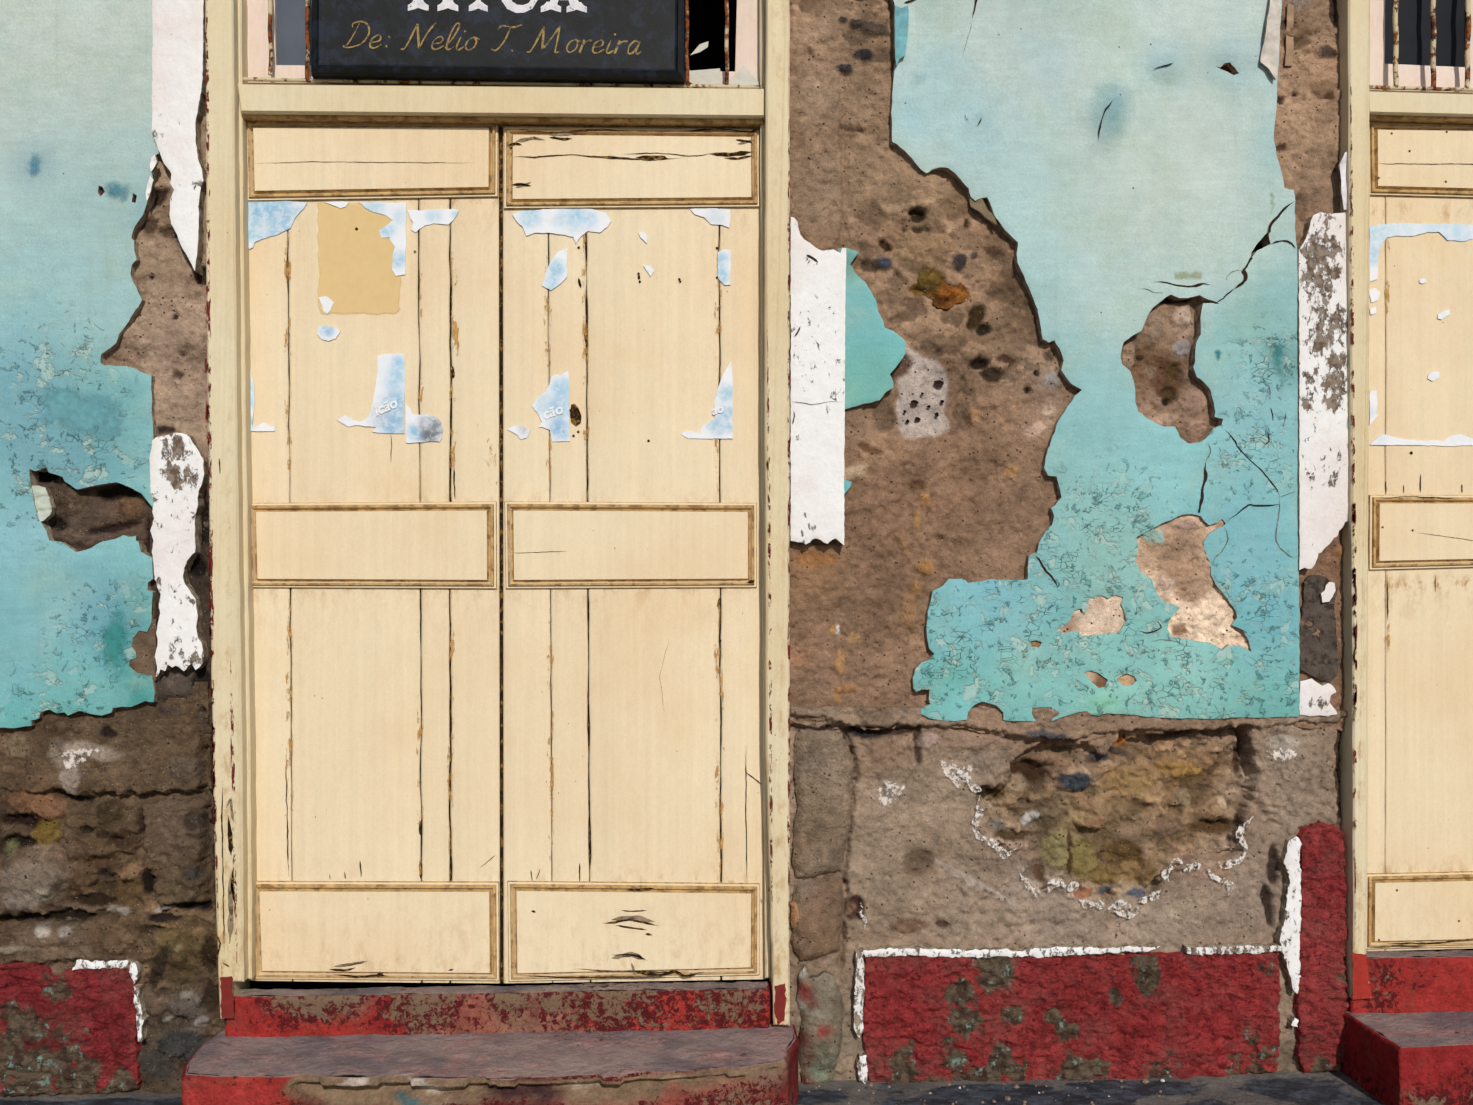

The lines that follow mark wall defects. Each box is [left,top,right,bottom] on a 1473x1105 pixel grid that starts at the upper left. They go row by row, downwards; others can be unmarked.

spalling [1260,0,1347,245]
crack [1140,202,1296,302]
spalling [32,472,154,556]
spalling [103,155,213,733]
spalling [789,0,1078,726]
peeling [1059,595,1125,635]
spalling [1120,297,1218,444]
spalling [1136,514,1249,650]
spalling [1292,529,1345,732]
spalling [923,702,1013,733]